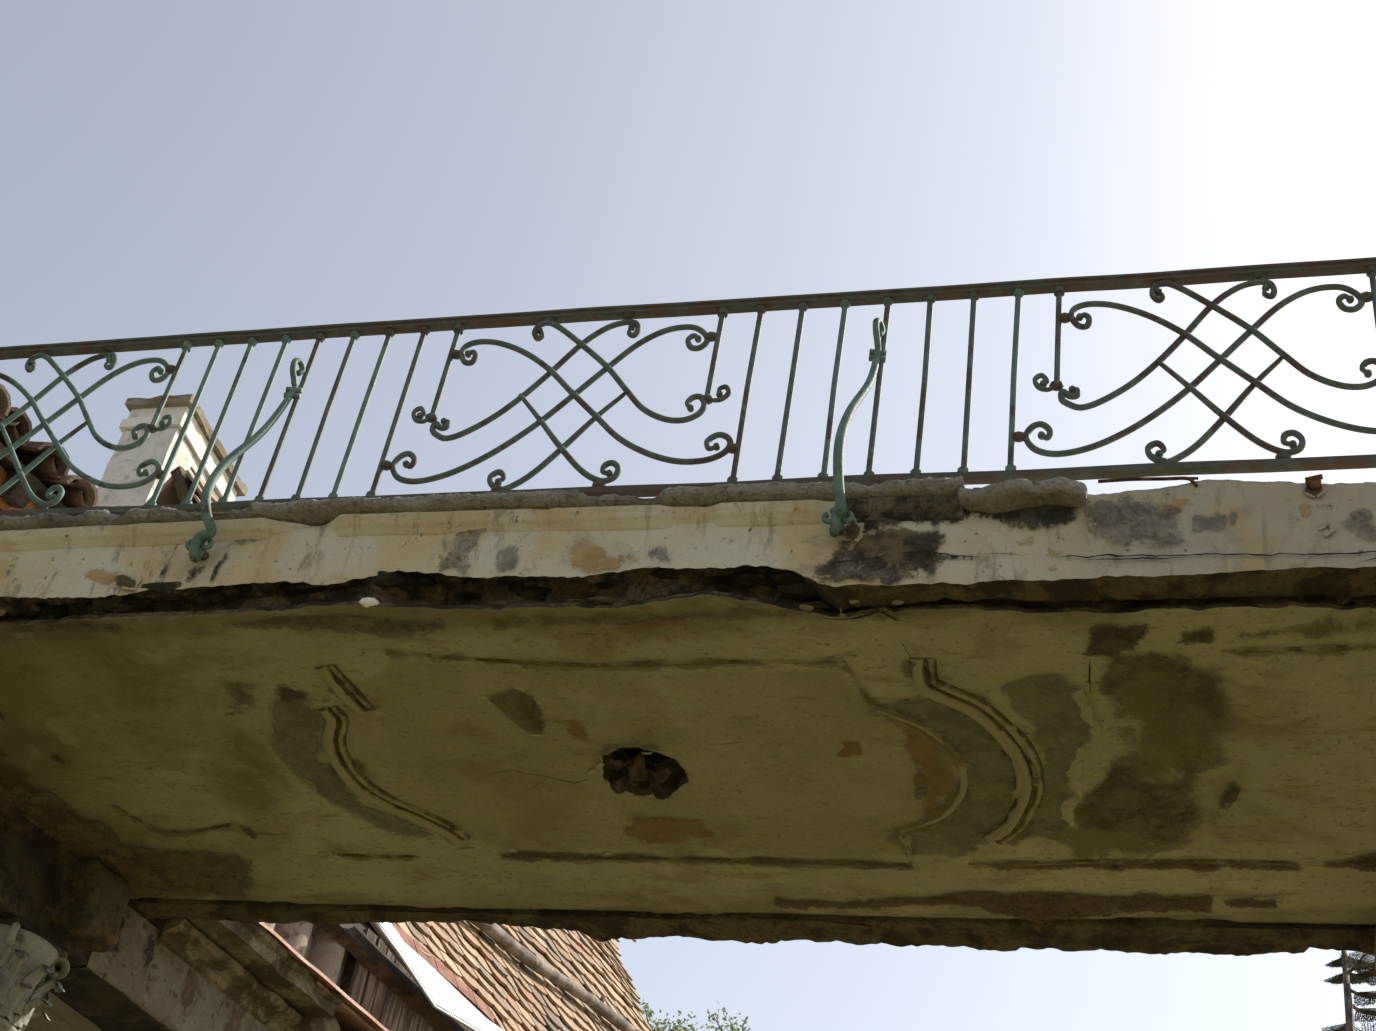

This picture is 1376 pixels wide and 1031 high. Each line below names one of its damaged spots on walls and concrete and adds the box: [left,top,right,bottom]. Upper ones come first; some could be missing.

damp [1158,499,1237,531]
crack [823,611,914,658]
spalling [588,742,689,795]
damp [1001,652,1233,859]
peeling [501,848,658,863]
peeling [774,891,1279,925]